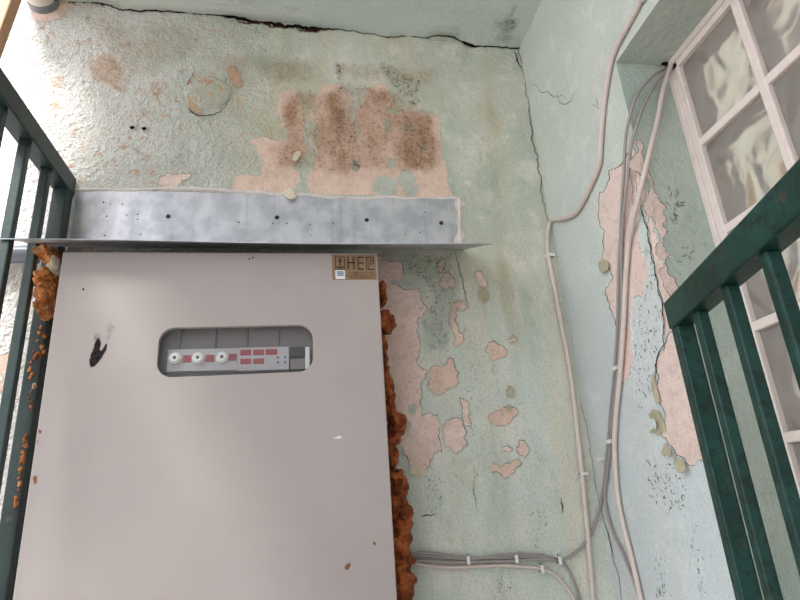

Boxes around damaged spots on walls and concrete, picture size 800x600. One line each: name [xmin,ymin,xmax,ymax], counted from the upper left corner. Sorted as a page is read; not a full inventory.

crack [68,2,574,221]
peeling [230,82,454,199]
peeling [371,252,473,476]
peeling [484,334,518,362]
peeling [487,385,519,428]
peeling [488,439,531,480]
crack [630,175,664,409]
peeling [598,140,703,473]